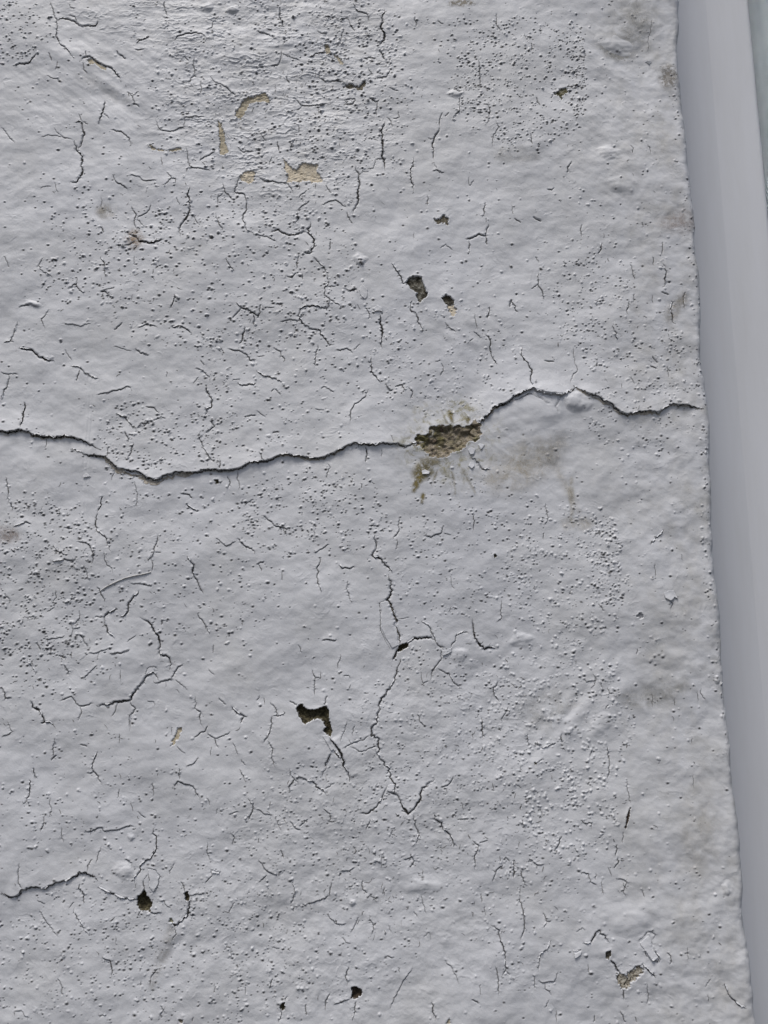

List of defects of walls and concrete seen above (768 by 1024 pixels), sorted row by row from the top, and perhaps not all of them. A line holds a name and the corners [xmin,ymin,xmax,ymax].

peeling [235,93,270,120]
peeling [240,171,255,184]
peeling [284,161,323,184]
peeling [406,276,428,302]
peeling [442,295,457,316]
crack [0,0,425,842]
spalling [414,419,484,469]
peeling [616,936,658,990]